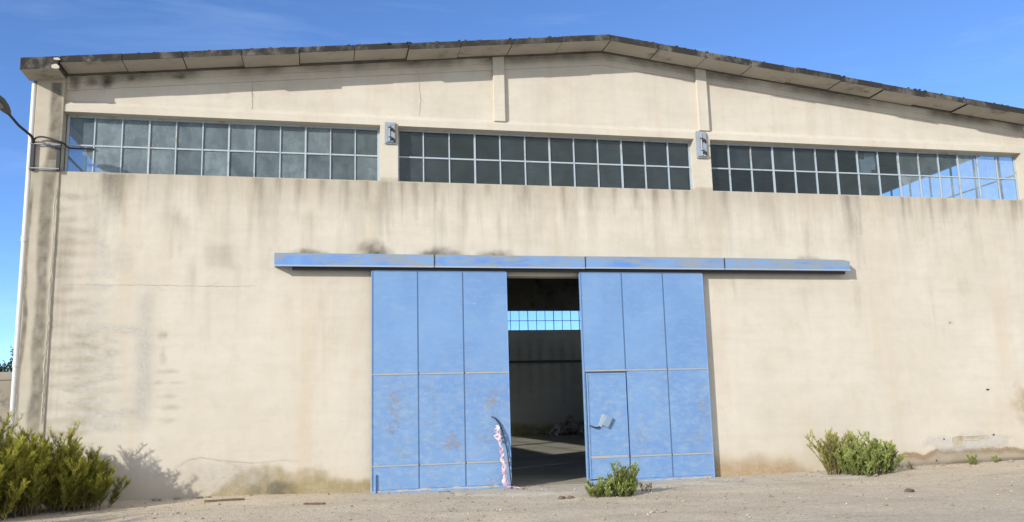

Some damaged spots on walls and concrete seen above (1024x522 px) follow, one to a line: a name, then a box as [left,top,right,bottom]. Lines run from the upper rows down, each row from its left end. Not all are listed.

damp [51,84,61,151]
flaking render [893,434,1024,467]
damp [213,470,370,496]